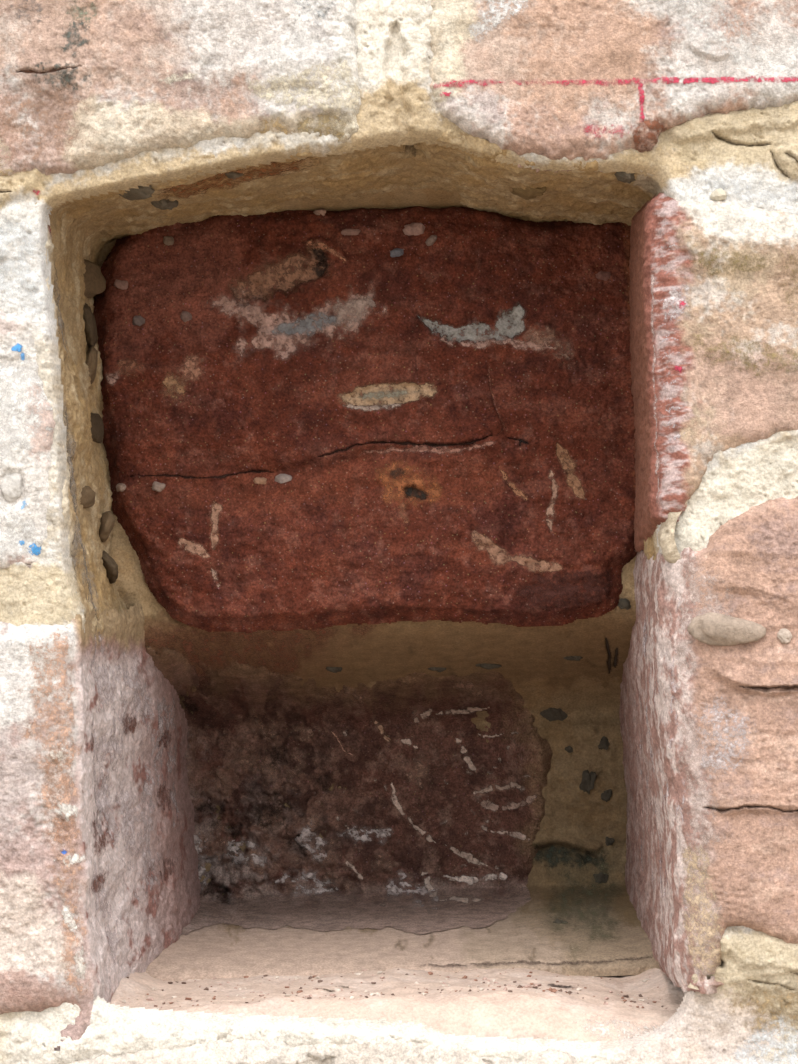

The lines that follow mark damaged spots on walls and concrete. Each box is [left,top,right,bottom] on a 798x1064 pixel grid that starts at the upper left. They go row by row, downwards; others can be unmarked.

crack [19,66,76,74]
crack [318,366,529,457]
crack [130,470,273,478]
crack [740,683,798,691]
crack [706,805,792,813]